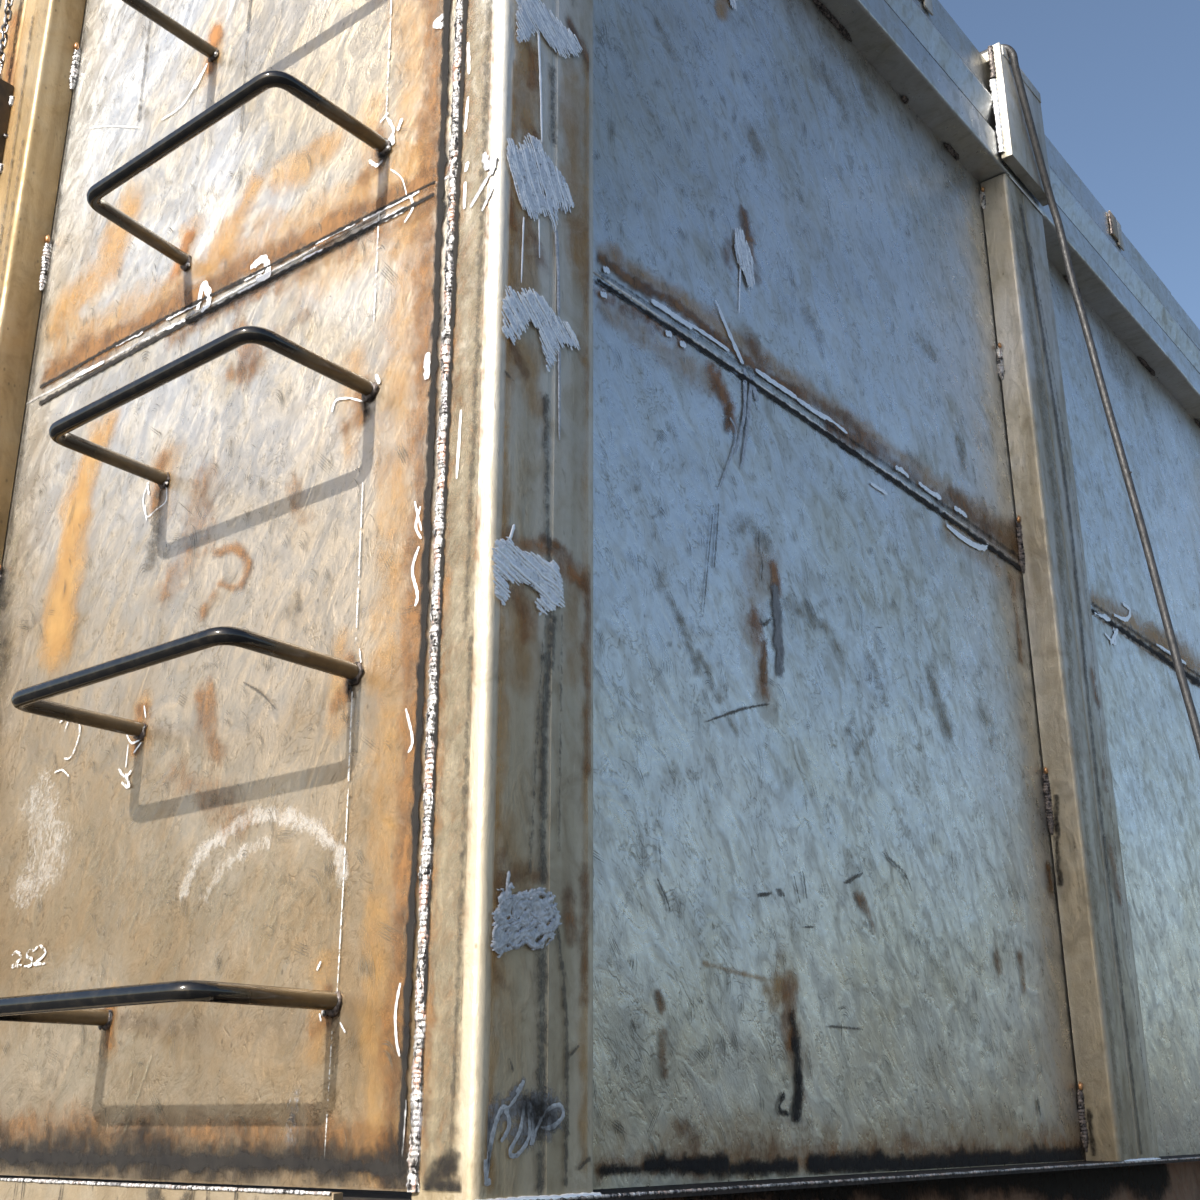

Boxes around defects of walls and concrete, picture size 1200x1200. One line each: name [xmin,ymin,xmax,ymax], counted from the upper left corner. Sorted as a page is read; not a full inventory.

corrosion [511,39,538,141]
corrosion [567,19,589,73]
corrosion [42,166,438,383]
corrosion [508,177,536,296]
corrosion [741,207,754,258]
corrosion [587,250,1018,553]
corrosion [44,420,114,662]
corrosion [144,454,167,567]
corrosion [214,544,251,588]
corrosion [770,561,828,630]
corrosion [499,482,591,823]
corrosion [752,610,768,695]